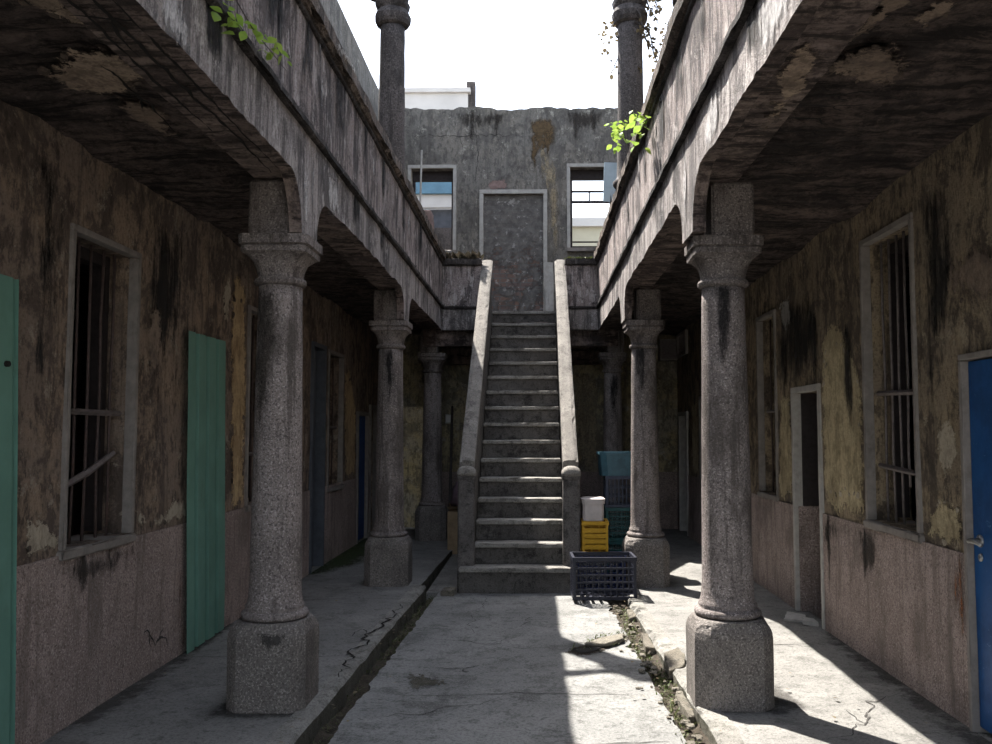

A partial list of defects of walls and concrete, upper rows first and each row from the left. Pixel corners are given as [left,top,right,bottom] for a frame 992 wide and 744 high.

spalling [18,0,83,24]
spalling [909,0,957,28]
spalling [829,0,913,87]
spalling [37,45,177,136]
spalling [764,44,817,131]
leakage [844,323,853,422]
peeling [25,519,59,556]
leakage [73,551,120,592]
leakage [860,529,875,575]
peeling [927,499,962,546]
crack [338,603,403,677]
spalling [566,633,629,655]